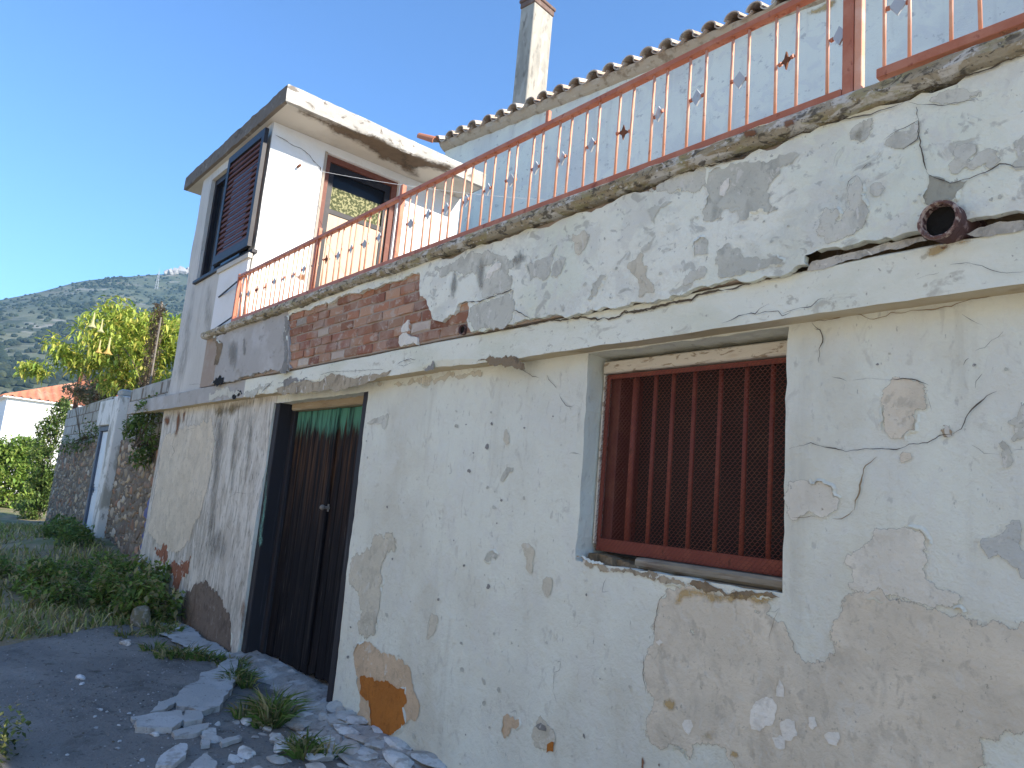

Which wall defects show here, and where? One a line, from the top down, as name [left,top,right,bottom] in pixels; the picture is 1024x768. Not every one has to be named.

peeling [435,230,589,298]
peeling [583,242,662,300]
spalling [209,274,539,402]
leakage [214,405,238,486]
crack [794,333,1002,519]
peeling [878,377,931,462]
peeling [148,417,232,652]
peeling [784,478,841,521]
peeling [980,520,1024,578]
peeling [347,533,424,739]
peeling [576,555,1024,768]